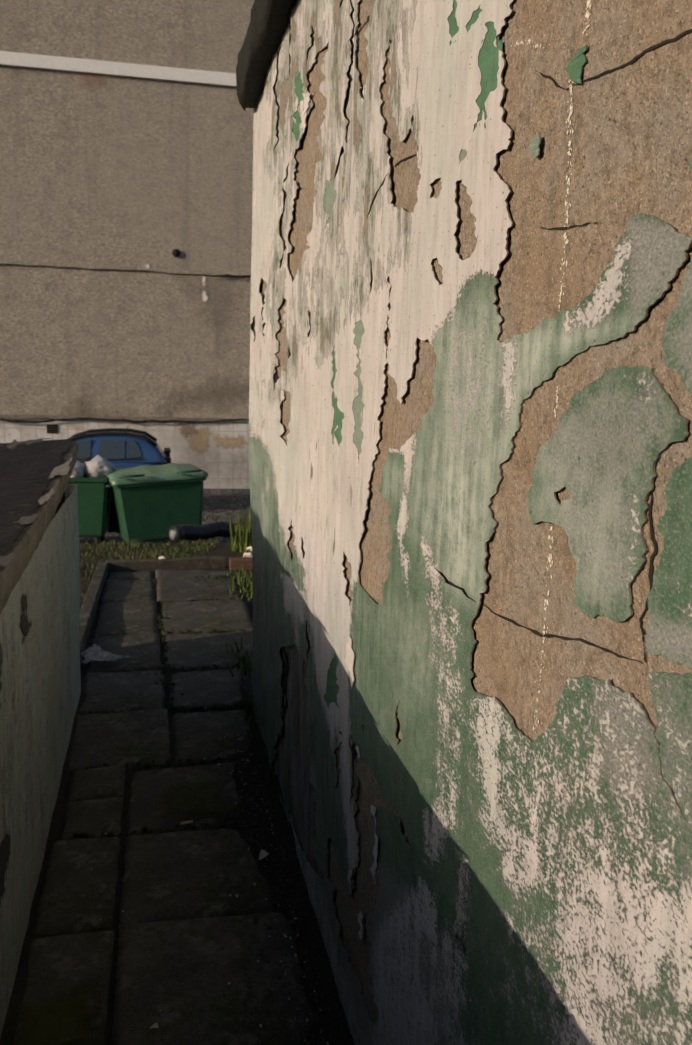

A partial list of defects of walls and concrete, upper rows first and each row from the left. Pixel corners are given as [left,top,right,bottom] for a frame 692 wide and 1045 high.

flaking render [288,45,337,282]
flaking render [356,0,375,99]
flaking render [380,40,442,213]
crack [540,29,692,90]
peeling [259,279,267,309]
peeling [432,258,443,285]
peeling [263,298,291,444]
peeling [331,320,365,458]
flaking render [448,0,692,741]
flaking render [343,338,436,604]
crack [441,491,657,663]
peeling [324,635,355,708]